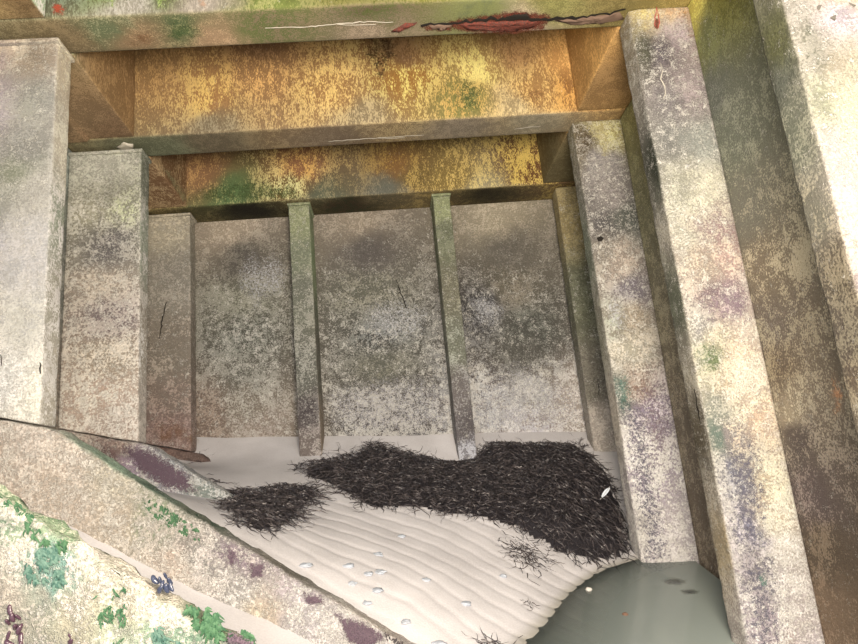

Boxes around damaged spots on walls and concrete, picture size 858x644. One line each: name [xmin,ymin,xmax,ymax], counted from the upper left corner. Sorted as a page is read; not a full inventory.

crack [273,9,626,35]